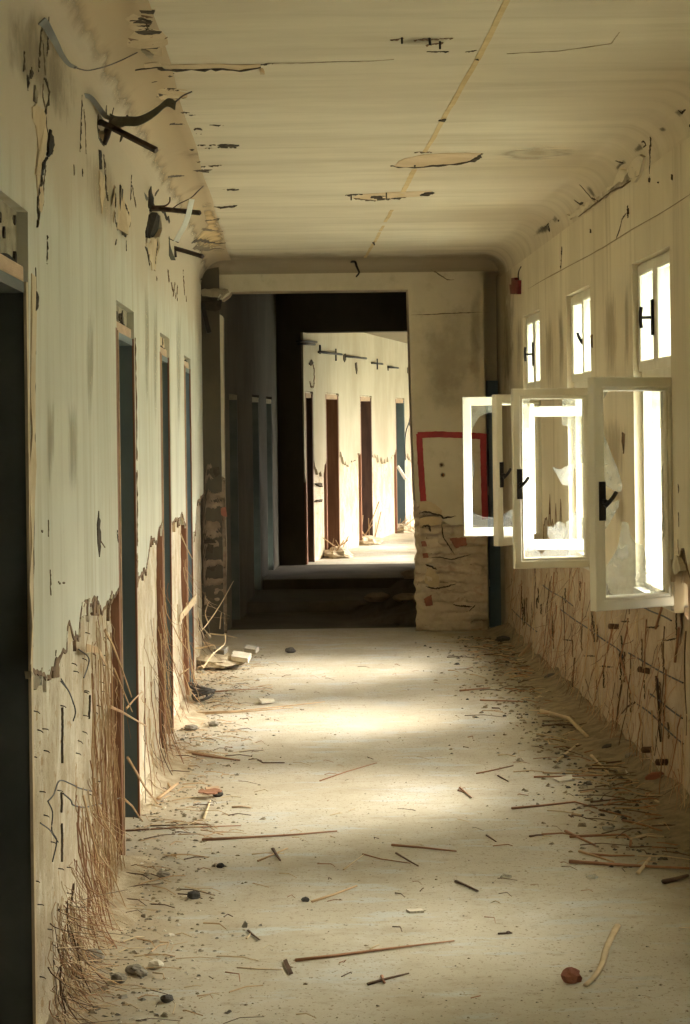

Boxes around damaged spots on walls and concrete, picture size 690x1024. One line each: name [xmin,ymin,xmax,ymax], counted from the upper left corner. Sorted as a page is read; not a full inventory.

spalling [23,17,50,91]
crack [135,59,394,75]
crack [507,32,620,54]
peeling [73,0,239,301]
spalling [345,191,434,202]
spalling [390,152,483,168]
spalling [412,497,488,631]
spalling [24,267,121,1024]